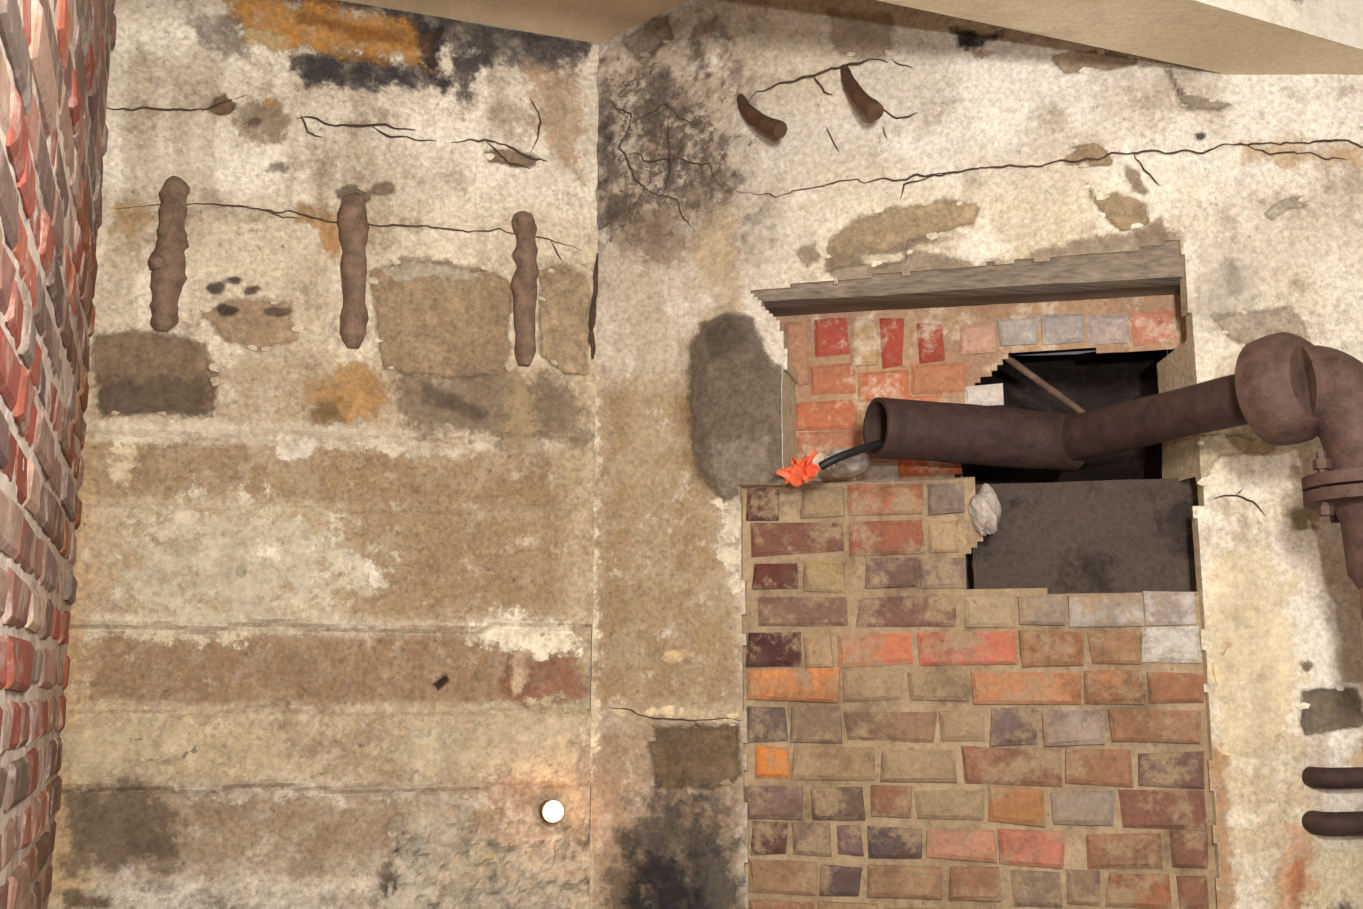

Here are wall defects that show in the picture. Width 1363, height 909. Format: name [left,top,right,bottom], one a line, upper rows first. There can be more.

rust [108,176,190,331]
spalling [91,330,225,418]
crack [106,94,248,111]
rust [295,193,387,424]
crack [297,99,546,169]
leakage [283,0,592,101]
spalling [367,256,515,378]
rust [511,211,539,367]
leakage [597,48,758,321]
spalling [798,199,979,272]
crack [609,58,1363,225]
leakage [58,482,745,909]